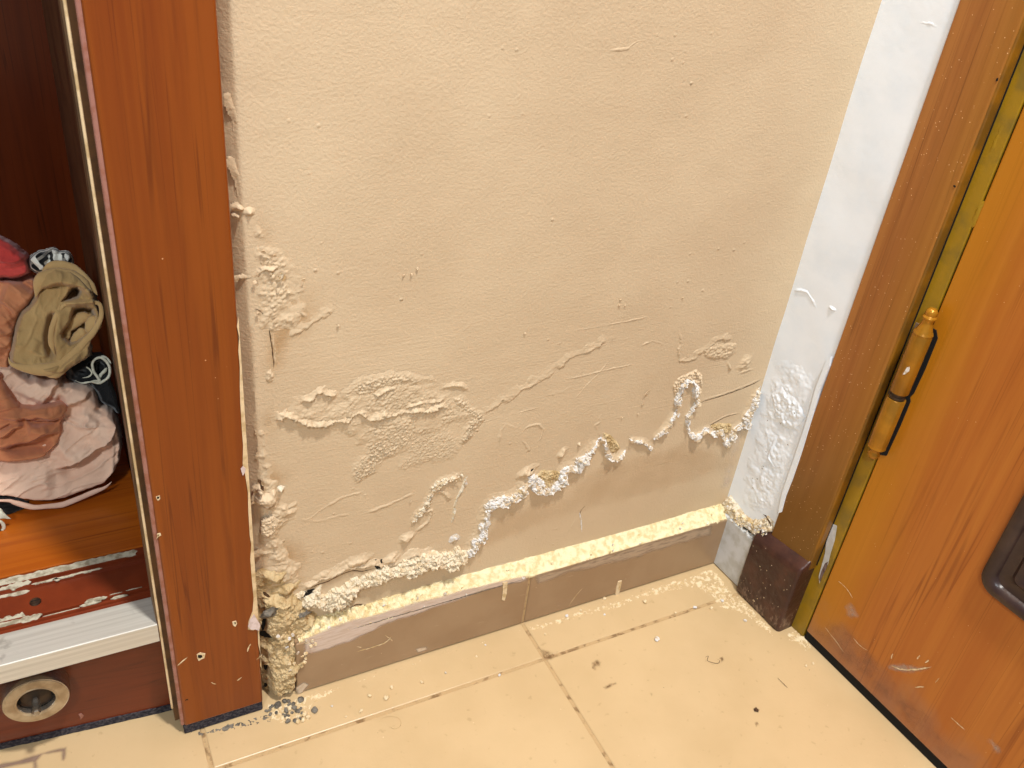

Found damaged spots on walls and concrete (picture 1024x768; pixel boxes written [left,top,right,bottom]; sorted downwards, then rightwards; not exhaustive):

peeling [246,224,344,342]
spalling [251,369,774,697]